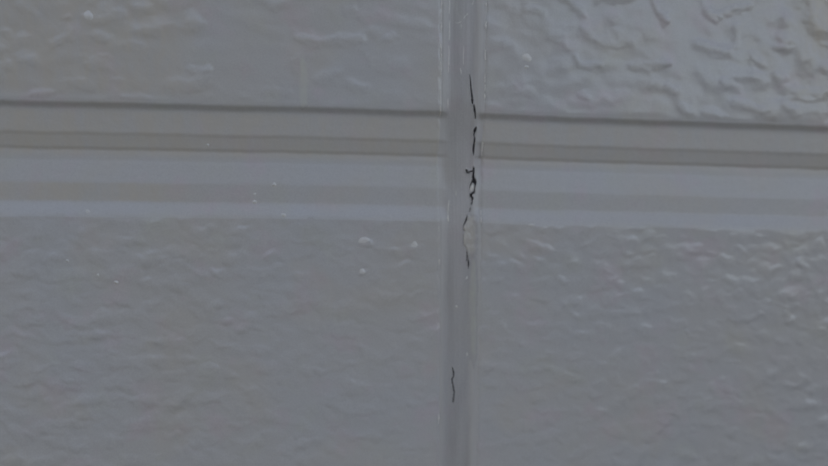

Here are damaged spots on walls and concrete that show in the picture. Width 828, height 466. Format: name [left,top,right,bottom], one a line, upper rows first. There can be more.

crack [465,74,477,204]